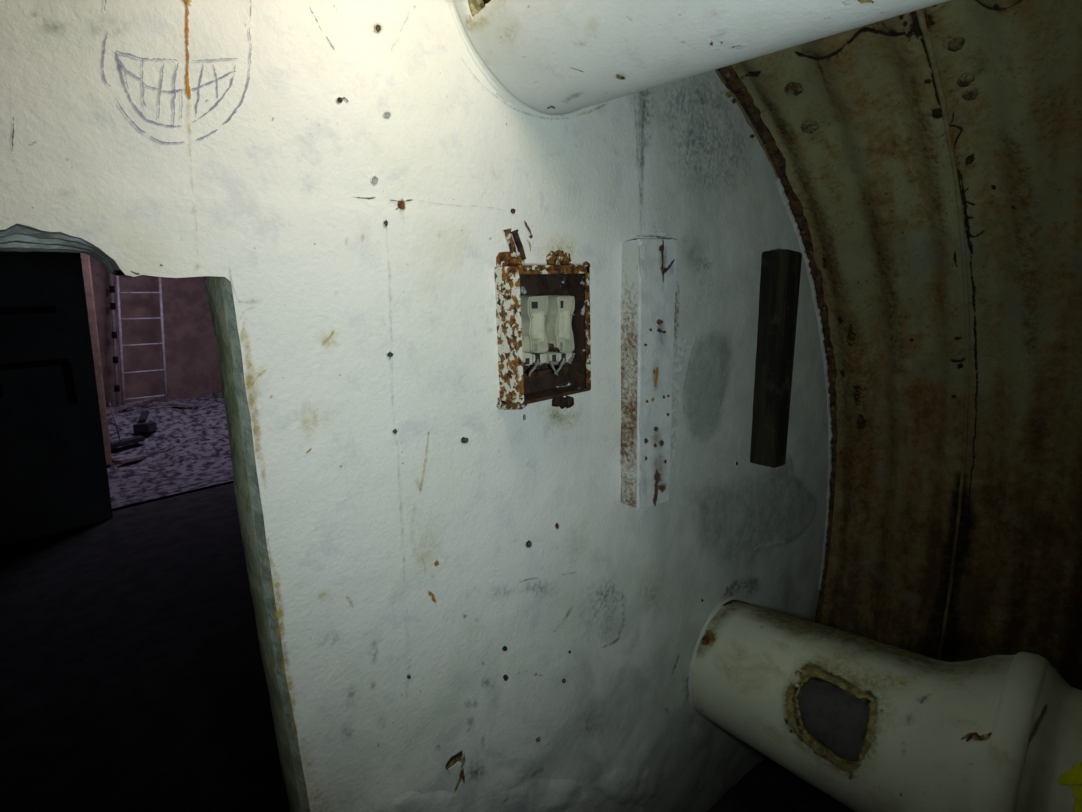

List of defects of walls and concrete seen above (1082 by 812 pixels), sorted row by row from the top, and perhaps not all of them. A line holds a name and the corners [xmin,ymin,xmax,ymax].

rust [183,0,191,99]
rust [961,185,985,254]